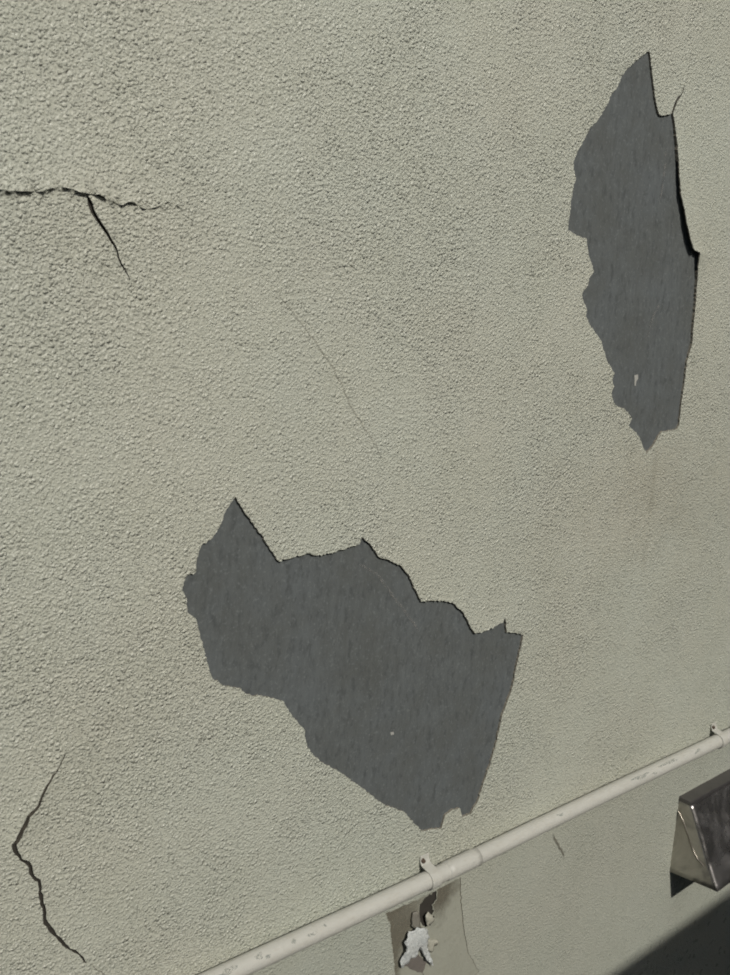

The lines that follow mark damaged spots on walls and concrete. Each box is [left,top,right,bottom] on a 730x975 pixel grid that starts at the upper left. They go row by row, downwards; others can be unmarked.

crack [0,187,178,279]
peeling [568,51,700,453]
peeling [182,497,523,831]
crack [11,754,104,975]
spalling [385,878,479,975]